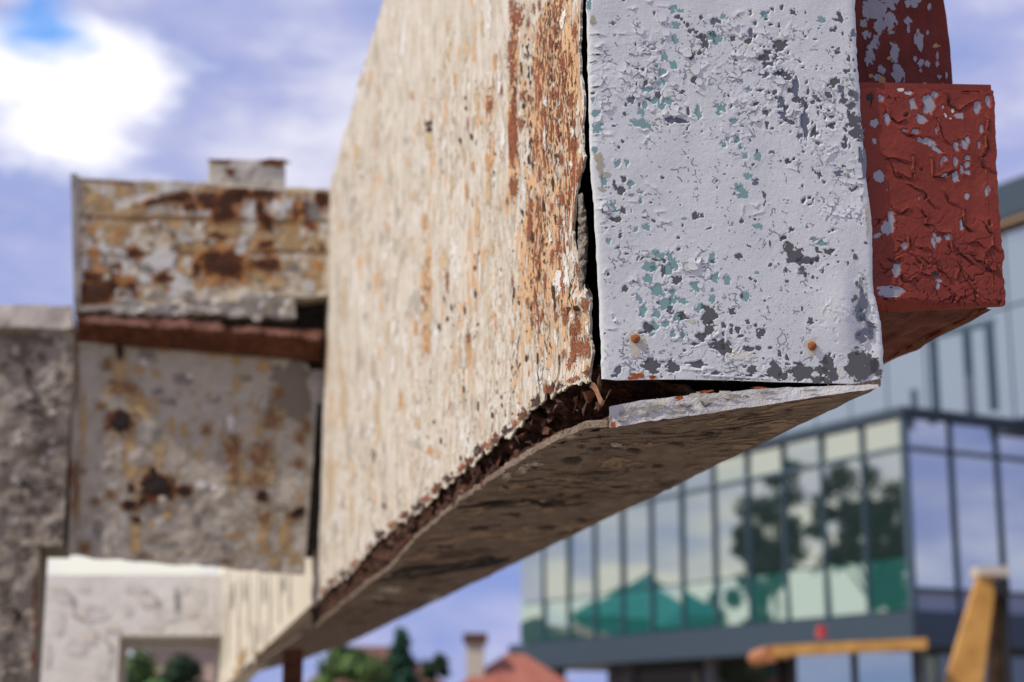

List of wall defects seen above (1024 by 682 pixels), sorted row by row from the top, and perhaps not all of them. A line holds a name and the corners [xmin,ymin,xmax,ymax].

peeling [626,11,716,108]
peeling [730,5,864,149]
corrosion [80,245,323,340]
corrosion [139,159,286,287]
corrosion [311,191,331,214]
corrosion [373,0,590,539]
crack [551,270,607,315]
peeling [637,255,715,285]
peeling [779,227,835,273]
peeling [640,358,721,375]
peeling [677,303,884,384]
corrosion [199,385,311,529]